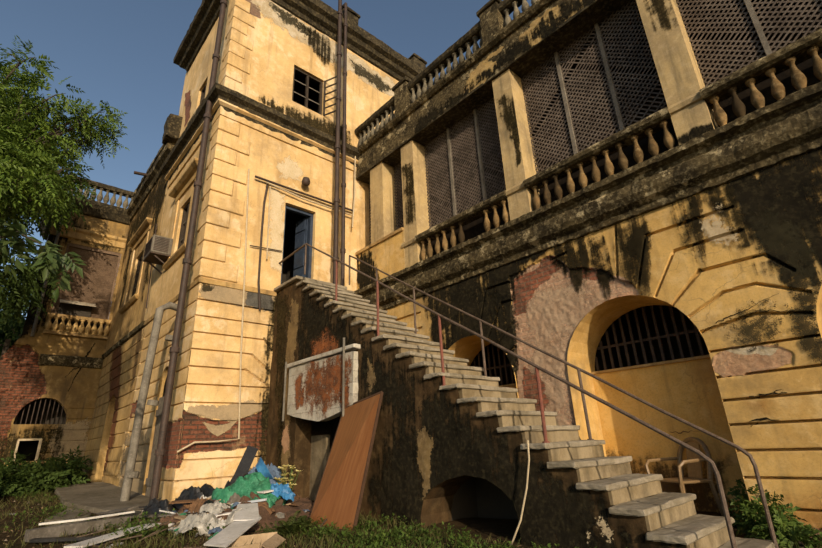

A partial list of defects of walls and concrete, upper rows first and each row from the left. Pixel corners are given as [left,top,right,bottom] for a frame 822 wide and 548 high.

flaking render [184,90,192,126]
damp [251,0,395,96]
damp [415,0,595,134]
damp [646,0,676,31]
damp [671,147,822,366]
flaking render [0,344,48,455]
flaking render [162,409,267,469]
damp [255,292,290,471]
corrosion [295,329,352,418]
damp [297,291,687,548]
flaking render [510,255,639,426]
spalling [712,345,792,377]